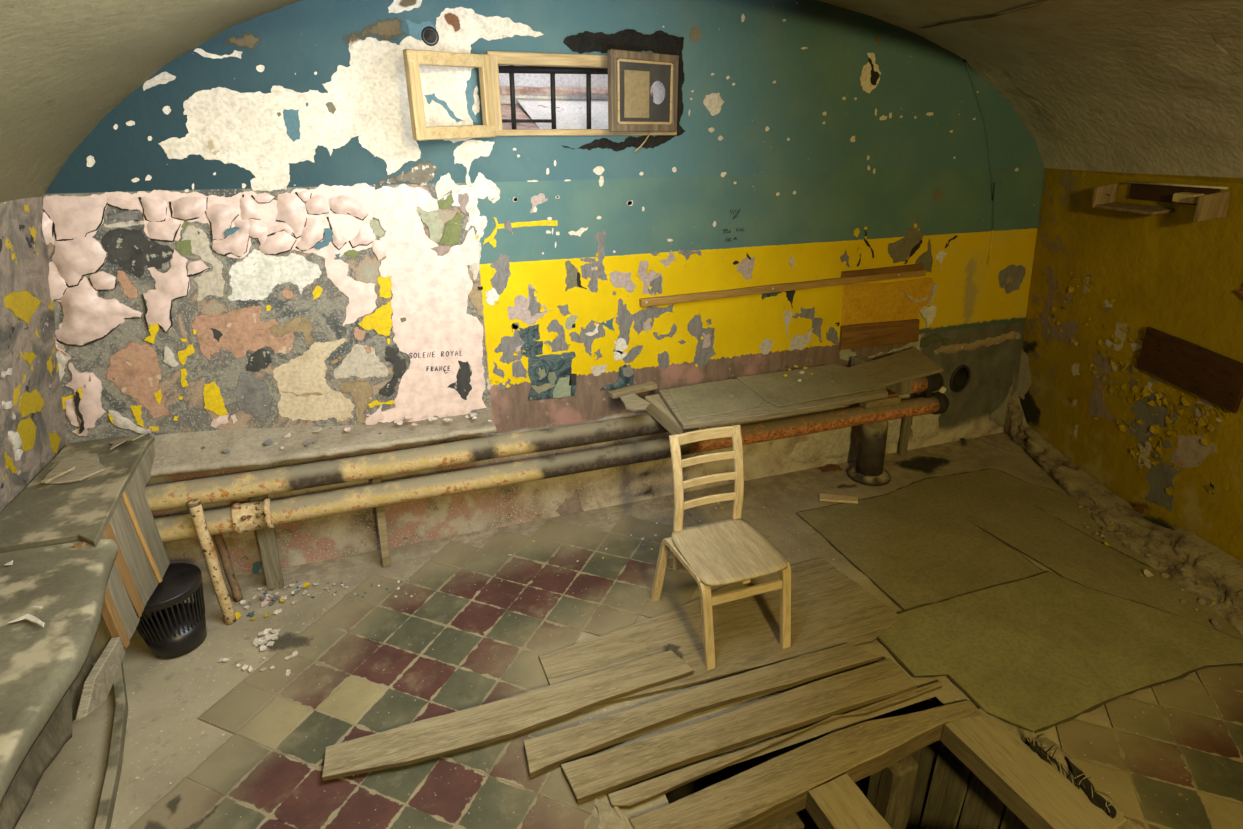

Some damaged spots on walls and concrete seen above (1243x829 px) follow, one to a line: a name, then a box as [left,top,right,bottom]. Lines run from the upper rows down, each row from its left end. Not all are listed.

peeling [688,90,724,141]
peeling [1,0,716,473]
peeling [733,254,756,280]
spalling [759,215,1021,361]
flaking render [998,264,1026,294]
spalling [783,426,855,465]
spalling [886,414,940,445]
spalling [1003,267,1243,634]
spalling [763,808,819,829]
spalling [665,696,944,804]
spalling [855,740,1029,829]
spalling [1021,730,1124,829]